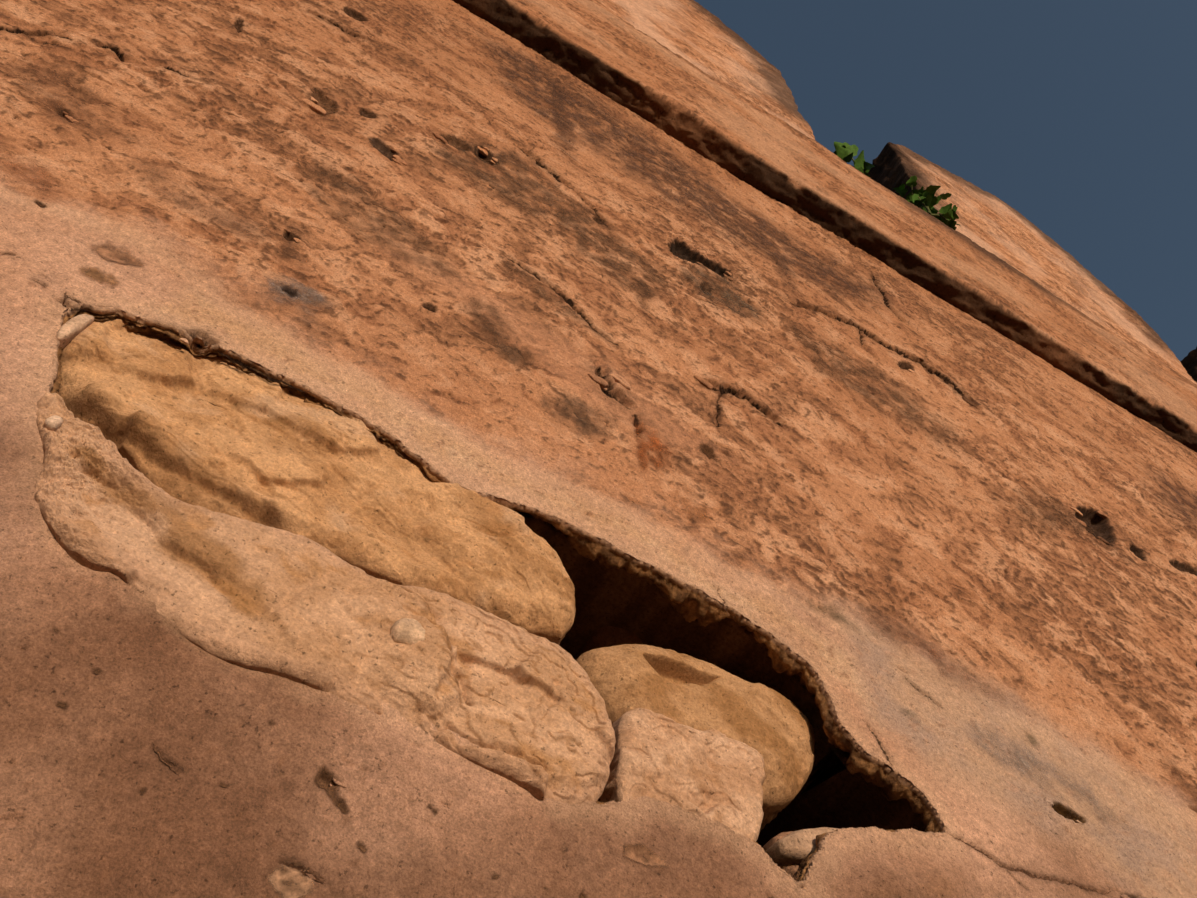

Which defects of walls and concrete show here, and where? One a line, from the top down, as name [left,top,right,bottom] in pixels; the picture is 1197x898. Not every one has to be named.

crack [693,375,781,427]
crack [790,275,976,408]
flaking render [35,303,949,888]
crack [955,838,1109,895]